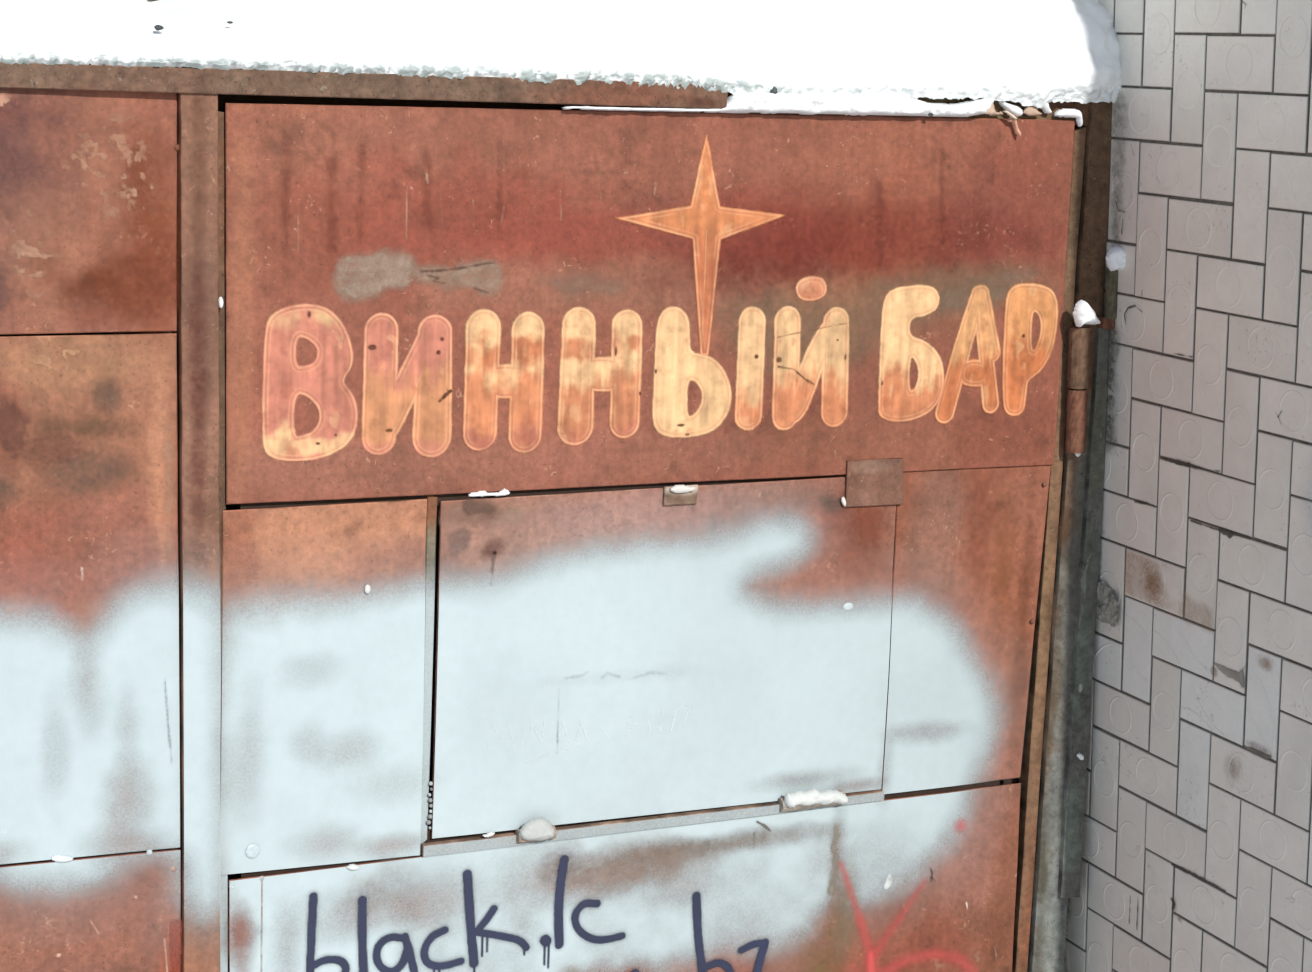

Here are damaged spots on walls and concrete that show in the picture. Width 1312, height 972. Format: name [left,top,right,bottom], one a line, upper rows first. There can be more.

peeling [72,134,154,214]
peeling [14,240,51,277]